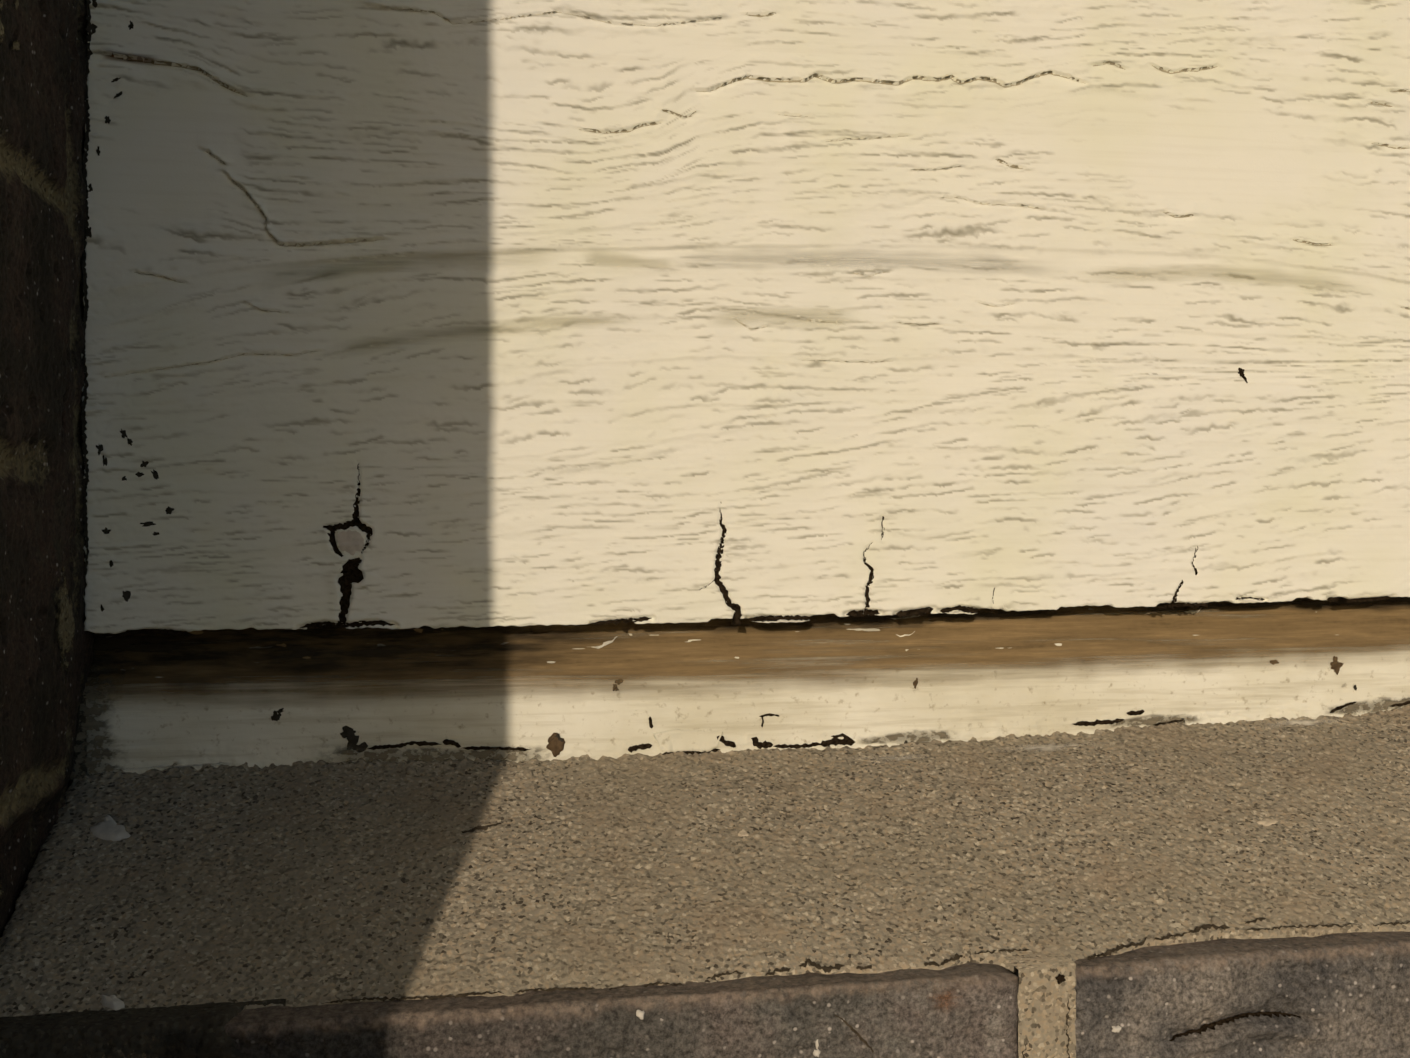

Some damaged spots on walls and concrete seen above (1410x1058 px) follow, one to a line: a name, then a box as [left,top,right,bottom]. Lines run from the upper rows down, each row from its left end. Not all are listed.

crack [579,61,1218,209]
water stain [88,625,577,677]
crack [323,464,373,626]
crack [700,510,742,625]
crack [863,516,885,613]
water stain [718,597,1410,630]
peeling [340,726,368,753]
peeling [546,733,565,757]